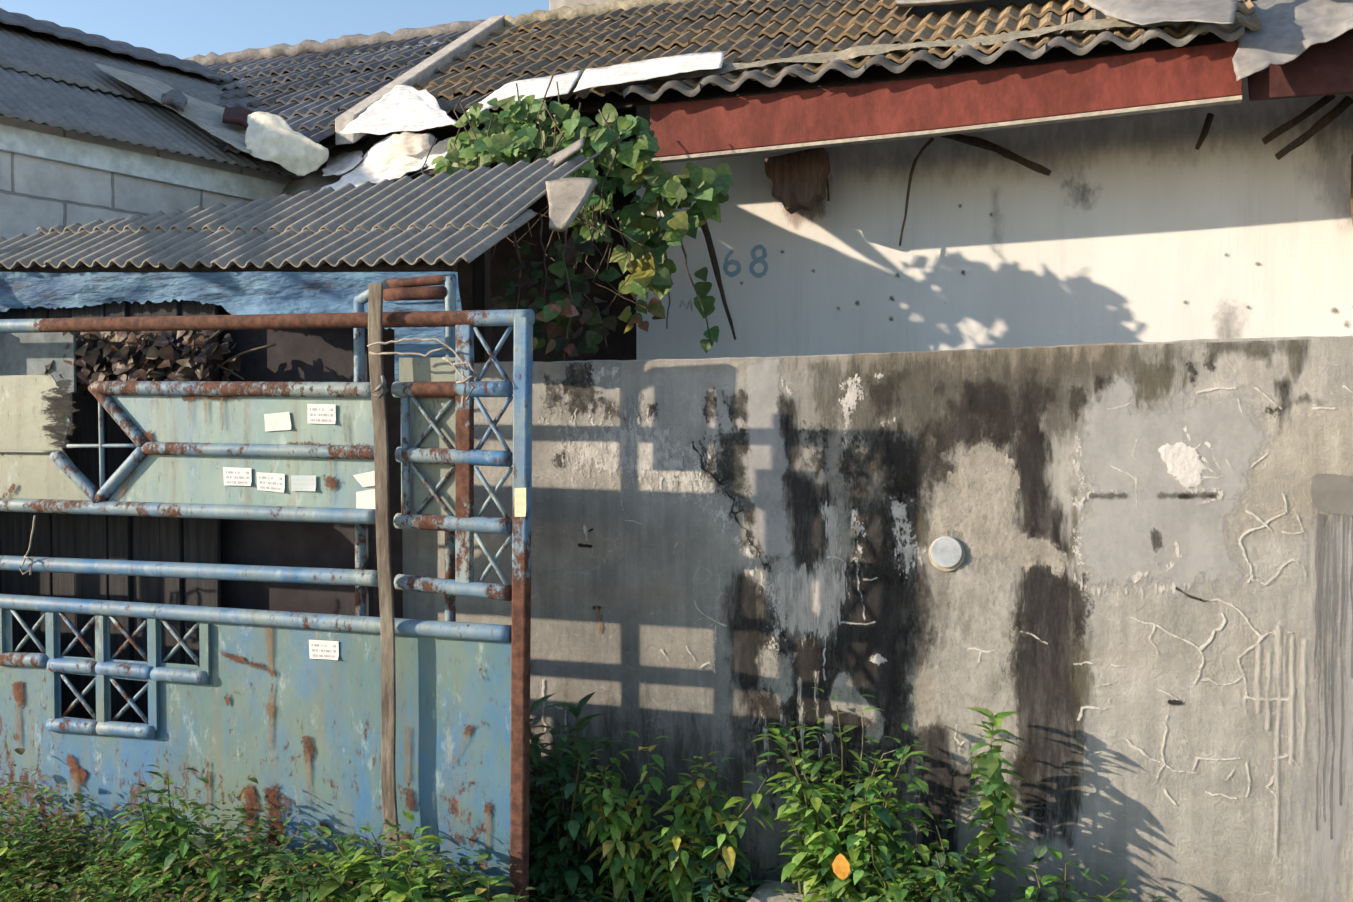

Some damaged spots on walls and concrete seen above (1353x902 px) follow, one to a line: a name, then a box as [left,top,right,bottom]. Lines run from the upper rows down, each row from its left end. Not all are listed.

rust [12,681,26,748]
rust [66,754,86,809]
rust [220,626,276,743]
rust [242,785,292,861]
rust [301,736,314,783]
water stain [535,340,1308,875]
spalling [902,442,1084,759]
crack [968,631,1048,663]
crack [1074,494,1306,806]
water stain [1311,540,1353,886]